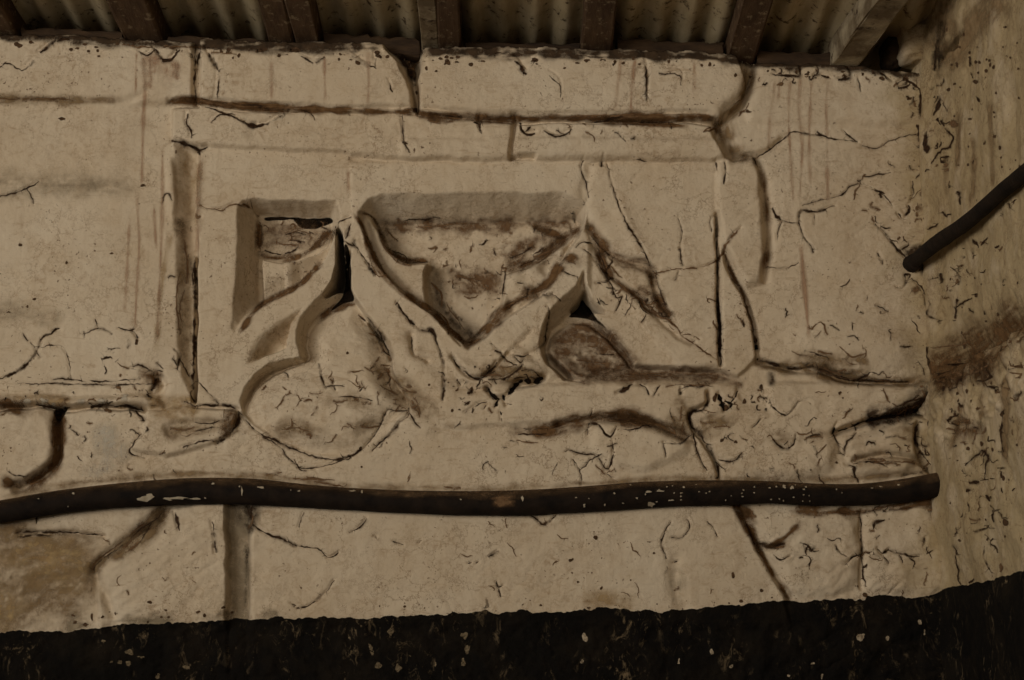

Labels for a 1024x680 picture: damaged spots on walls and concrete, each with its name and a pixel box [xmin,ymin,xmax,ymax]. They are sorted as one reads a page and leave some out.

crack [0,56,1023,596]